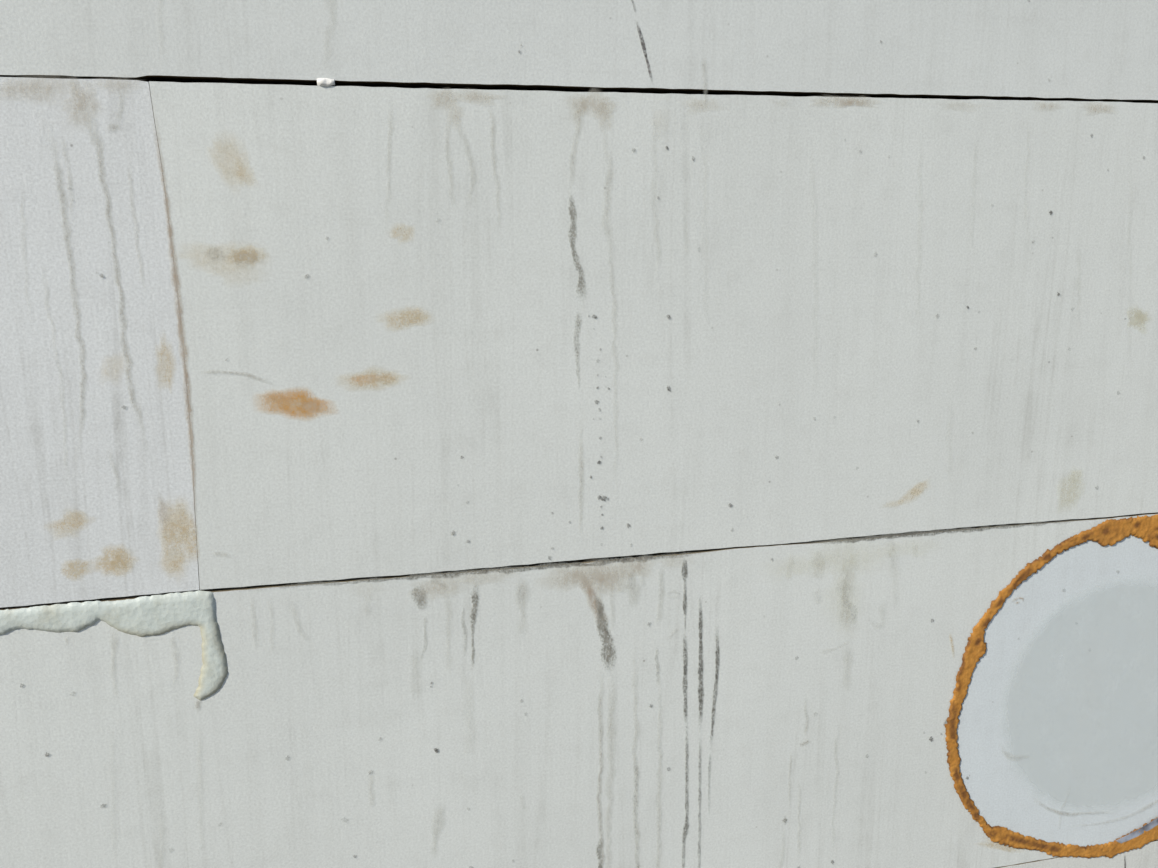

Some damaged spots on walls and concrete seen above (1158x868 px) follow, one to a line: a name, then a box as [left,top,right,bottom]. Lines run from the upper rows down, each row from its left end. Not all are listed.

rust [266,391,327,417]
damp [583,580,615,665]
damp [682,563,719,735]
damp [682,746,710,867]